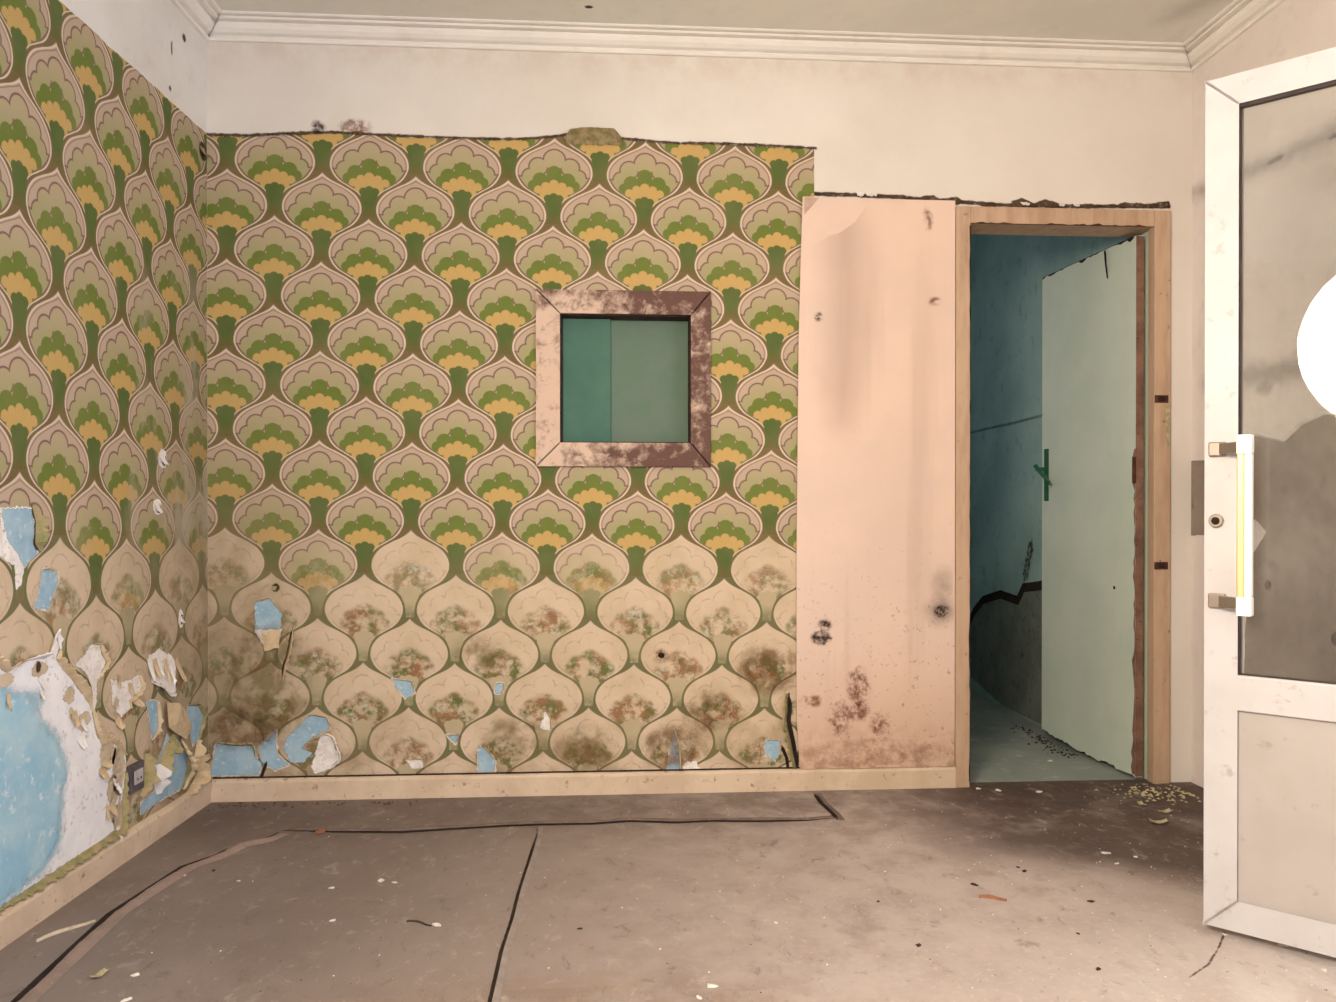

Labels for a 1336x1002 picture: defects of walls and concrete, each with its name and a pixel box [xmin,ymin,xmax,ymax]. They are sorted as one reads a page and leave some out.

spalling [969,222,1147,559]
peeling [0,505,60,613]
spalling [1191,459,1205,535]
spalling [1244,411,1336,682]
peeling [254,583,282,651]
leakage [746,650,791,690]
leakage [812,621,831,645]
spalling [969,541,1042,725]
peeling [0,629,341,912]
peeling [476,746,497,773]
leakage [649,730,682,763]
crack [11,693,845,1002]